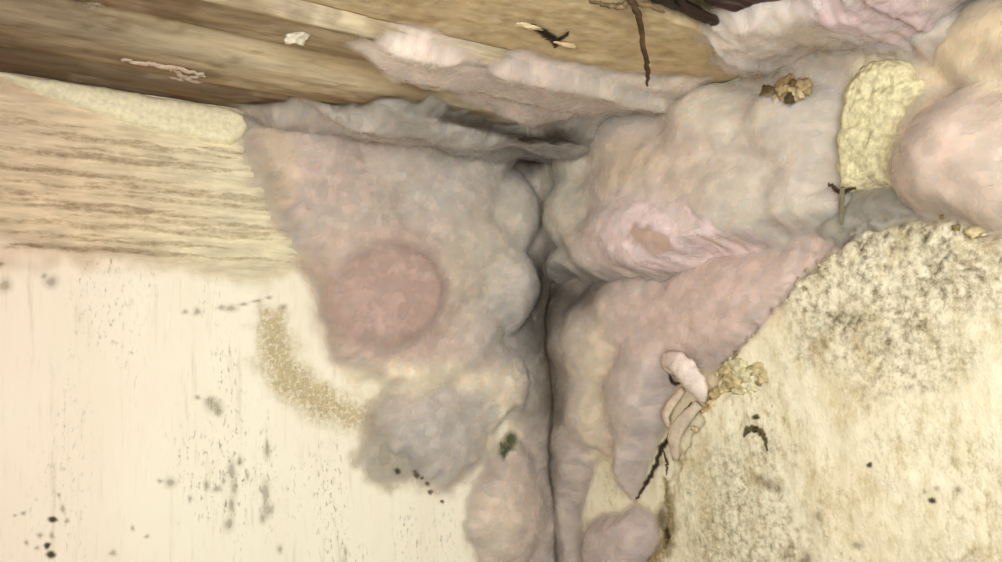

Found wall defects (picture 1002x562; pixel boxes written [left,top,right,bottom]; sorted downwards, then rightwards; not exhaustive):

crack [669,374,692,411]
crack [635,434,669,499]